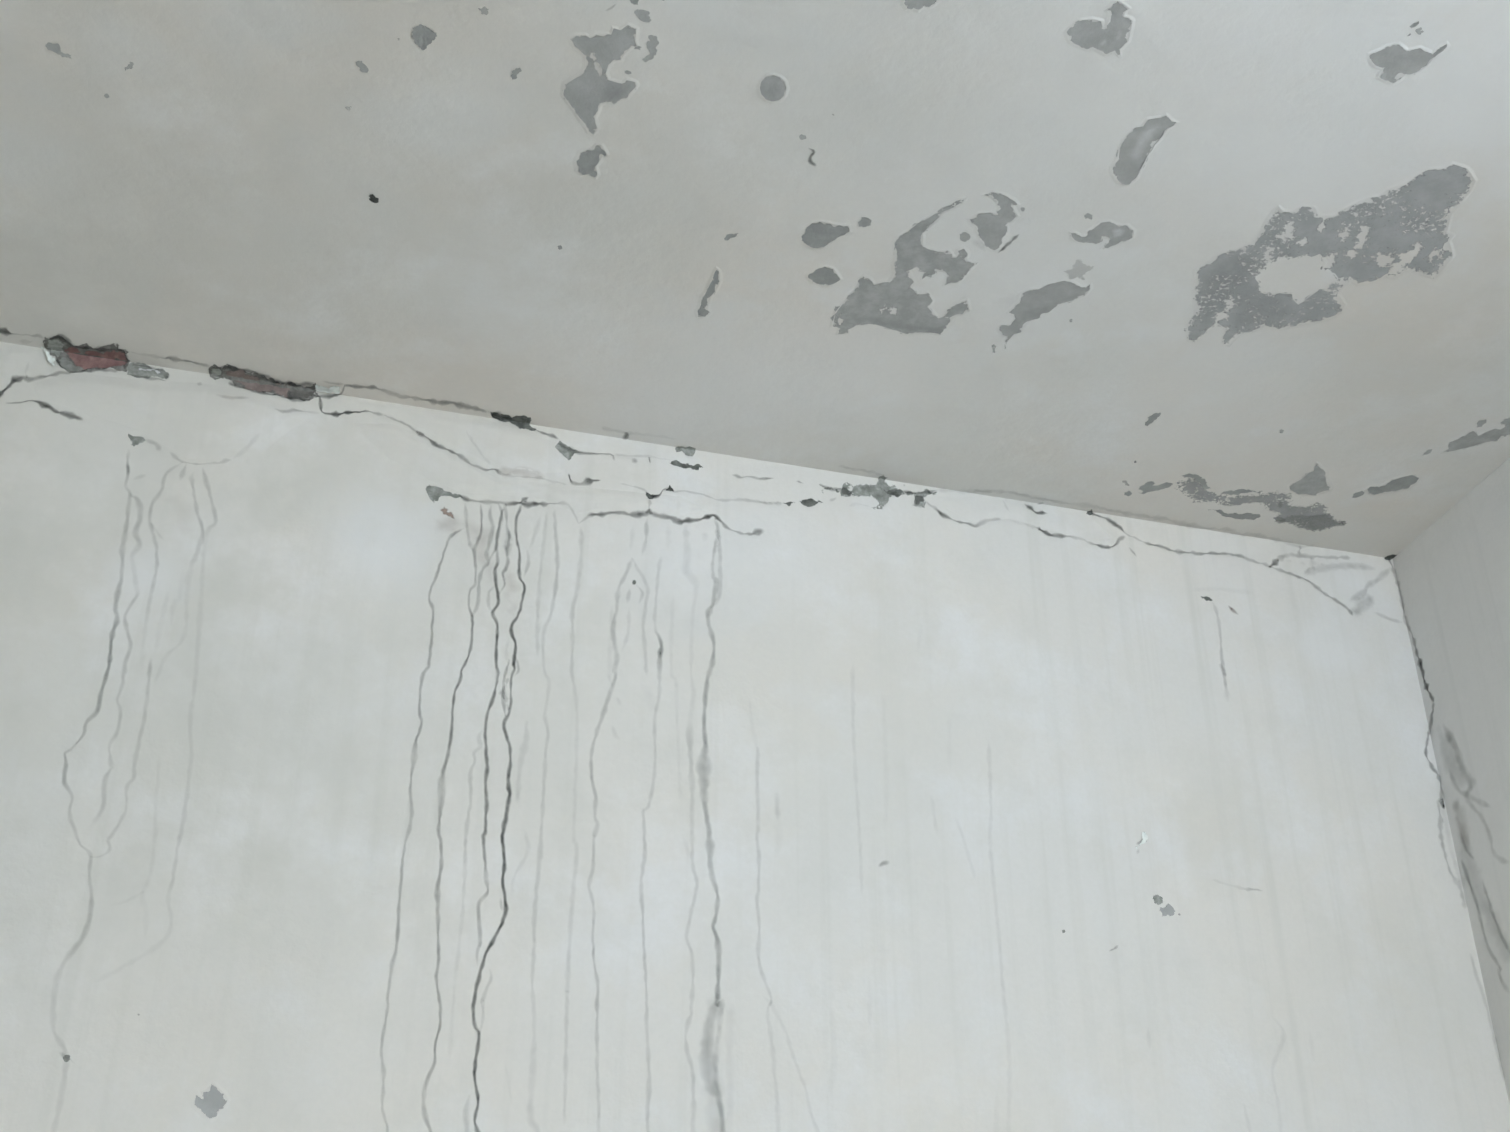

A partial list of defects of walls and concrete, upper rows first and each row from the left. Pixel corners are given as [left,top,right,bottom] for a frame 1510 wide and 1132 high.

peeling [560,0,664,179]
peeling [1109,112,1180,187]
peeling [798,189,1025,336]
peeling [1184,161,1478,348]
peeling [996,278,1094,346]
crack [0,378,74,417]
water stain [128,434,145,446]
crack [426,485,462,502]
crack [569,475,719,524]
water stain [495,517,525,667]
crack [1416,650,1433,699]
water stain [472,728,511,1125]